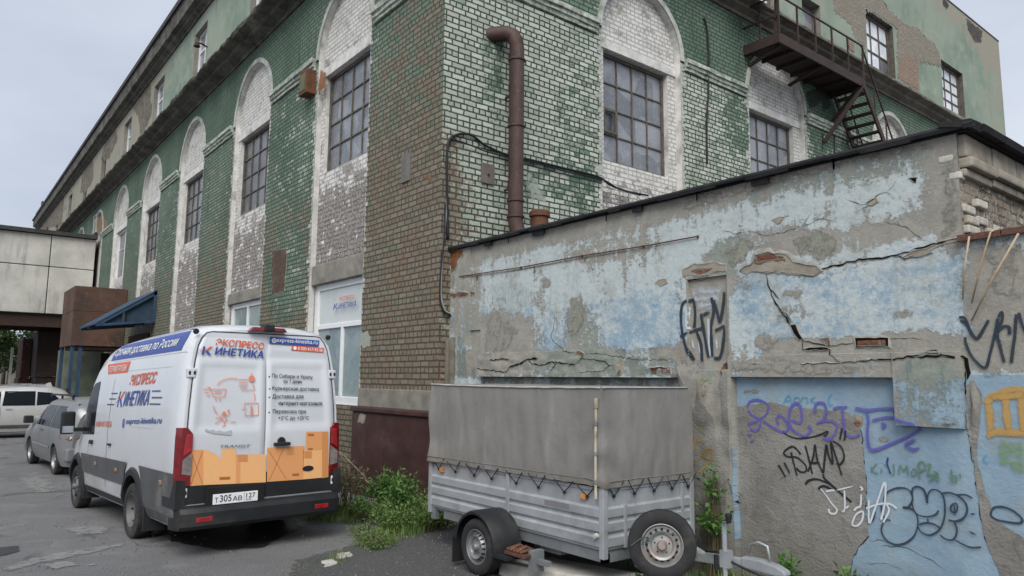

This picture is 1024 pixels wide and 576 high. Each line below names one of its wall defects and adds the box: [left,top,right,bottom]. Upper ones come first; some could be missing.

spalling [831,0,941,92]
rust [459,235,699,281]
spalling [682,230,836,278]
crack [477,315,665,373]
crack [748,275,971,399]